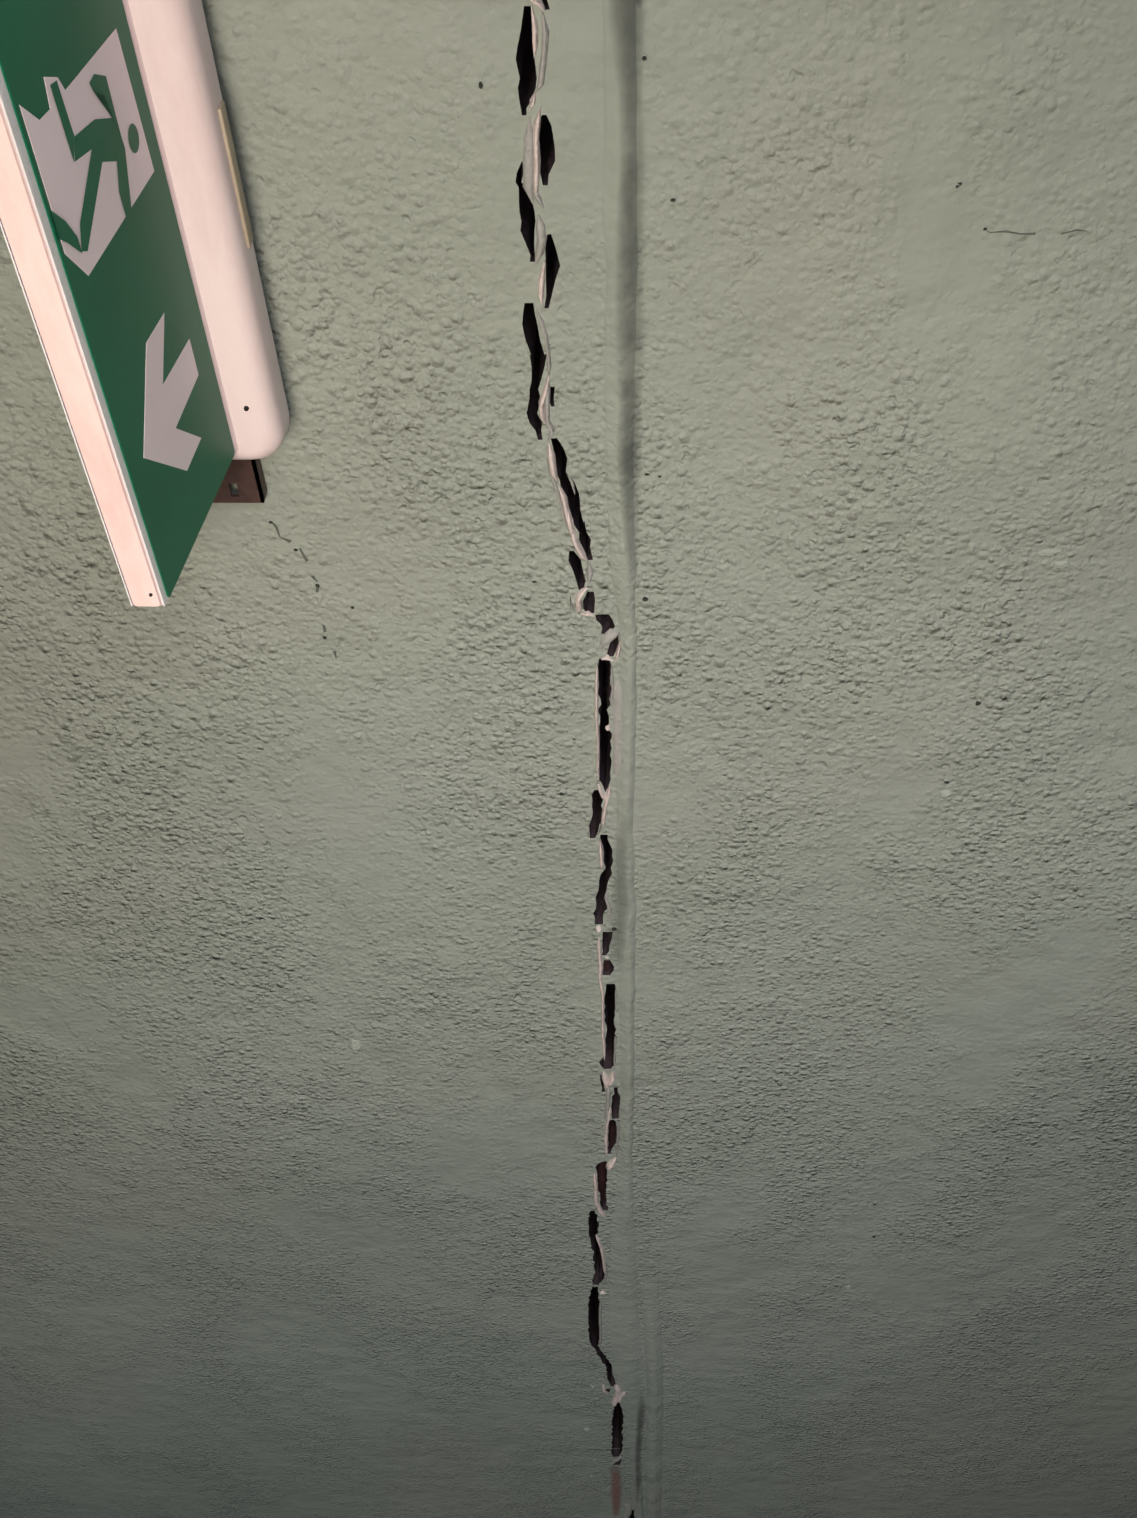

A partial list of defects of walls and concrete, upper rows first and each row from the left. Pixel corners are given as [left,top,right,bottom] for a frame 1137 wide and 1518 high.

crack [516,0,646,1465]
crack [622,1503,635,1518]